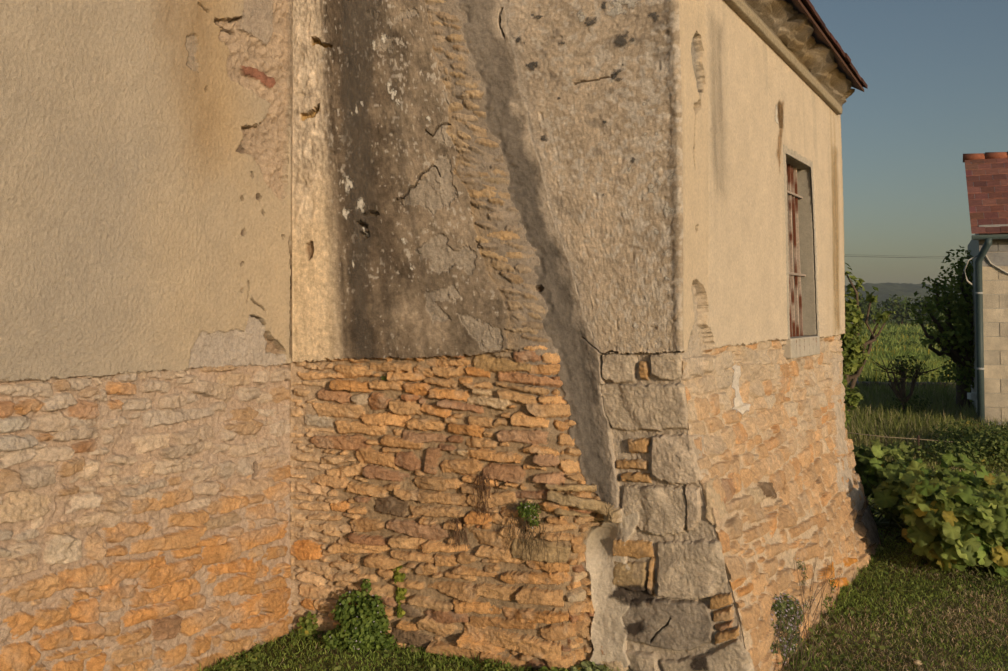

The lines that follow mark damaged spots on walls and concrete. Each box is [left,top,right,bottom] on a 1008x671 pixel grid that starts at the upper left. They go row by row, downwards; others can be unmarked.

spalling [217,0,320,216]
damp [343,0,377,356]
crack [396,165,441,200]
peeling [402,89,458,214]
crack [427,122,451,137]
spalling [691,31,706,113]
peeling [415,233,477,274]
spalling [189,314,288,368]
peeling [425,284,504,352]
spalling [681,279,715,358]